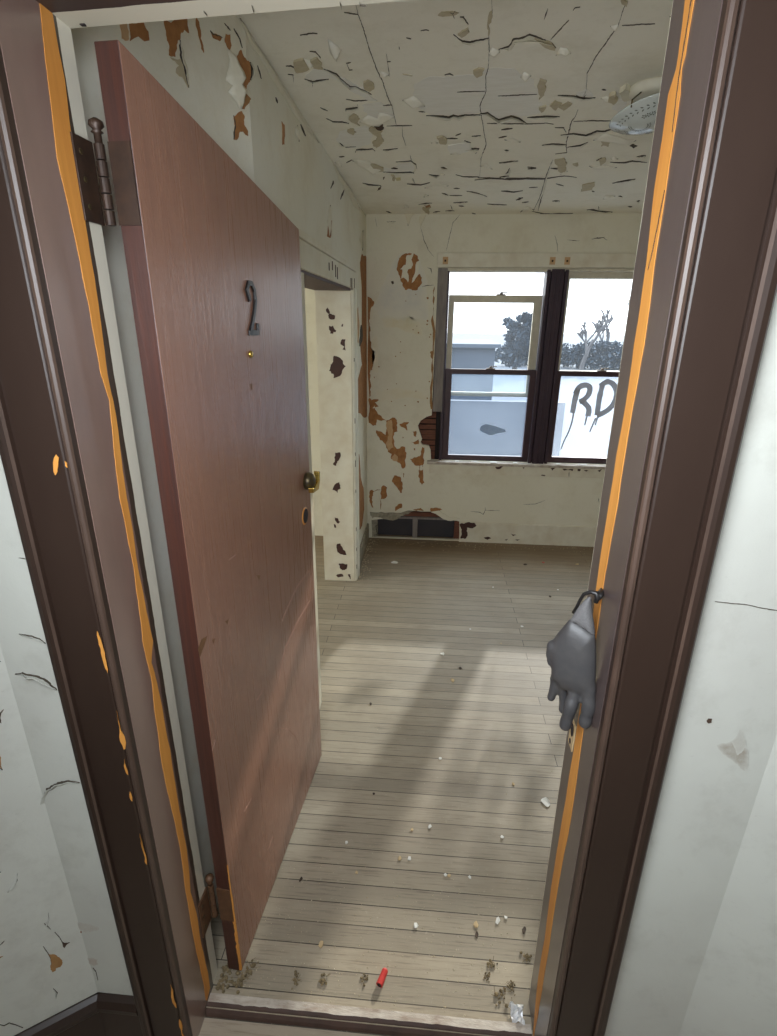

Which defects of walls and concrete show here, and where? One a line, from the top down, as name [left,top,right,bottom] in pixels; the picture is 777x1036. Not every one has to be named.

peeling [164,11,232,88]
peeling [286,51,417,191]
crack [224,0,671,257]
peeling [403,67,631,124]
peeling [326,230,476,539]
peeling [541,0,695,639]
peeling [39,3,210,1000]
peeling [336,544,357,579]
crack [0,661,57,691]
crack [19,634,46,644]
peeling [533,703,584,1036]